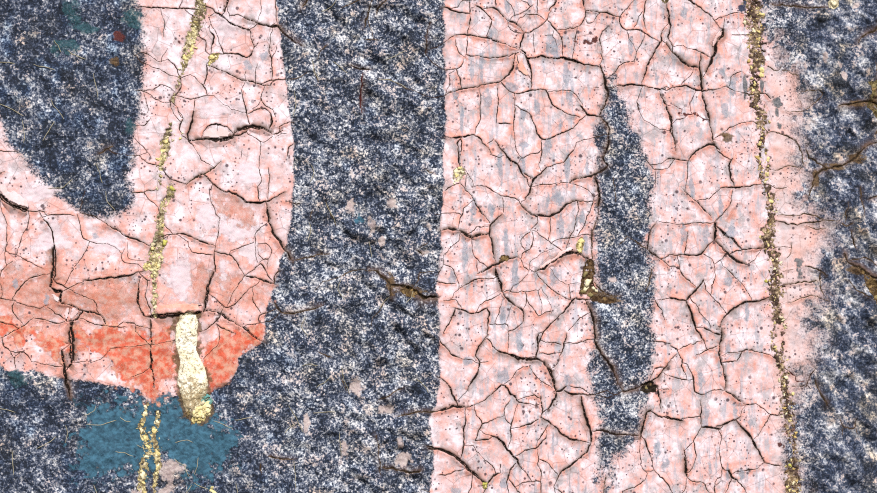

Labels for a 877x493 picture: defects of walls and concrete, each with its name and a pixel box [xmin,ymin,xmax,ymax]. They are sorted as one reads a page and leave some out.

peeling [0,184,28,208]
crack [315,0,877,493]
spalling [400,285,419,297]
spalling [860,270,877,304]
spalling [640,381,658,393]
flaking render [140,405,161,466]